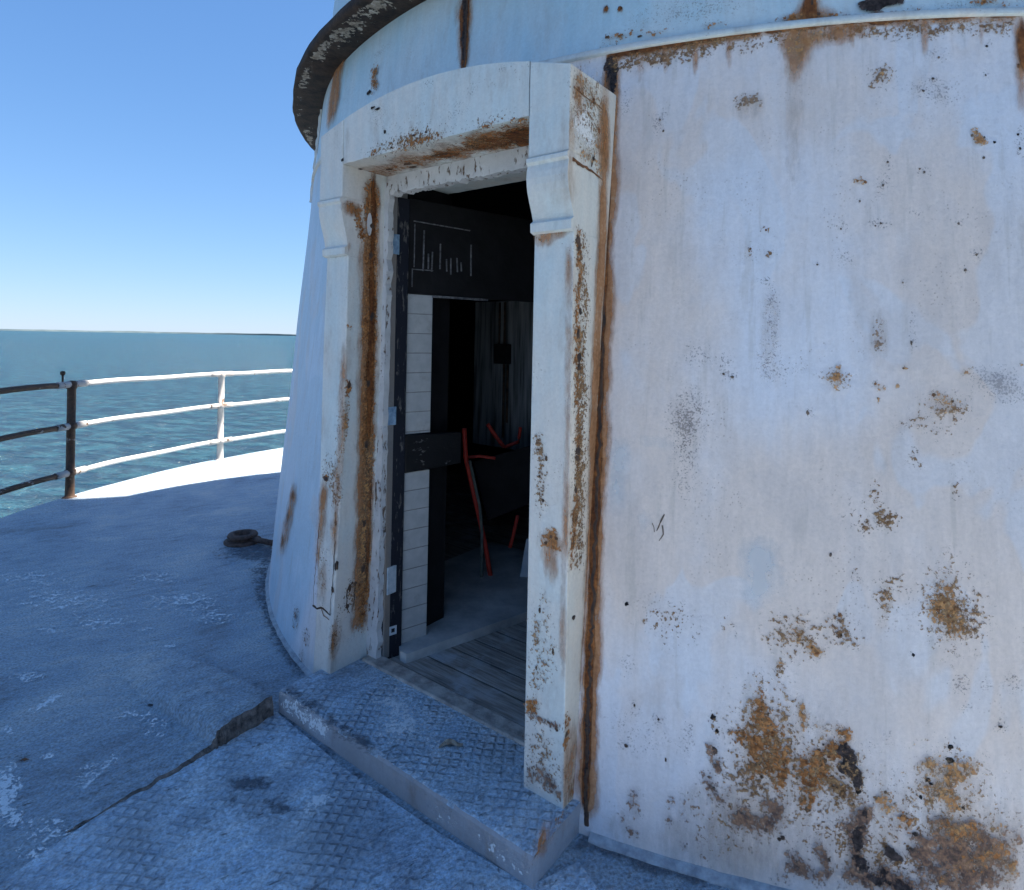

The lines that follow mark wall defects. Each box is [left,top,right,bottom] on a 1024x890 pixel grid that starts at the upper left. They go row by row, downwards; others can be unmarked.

rust [459,0,471,68]
rust [280,489,295,547]
rust [316,114,529,633]
rust [535,0,1024,890]